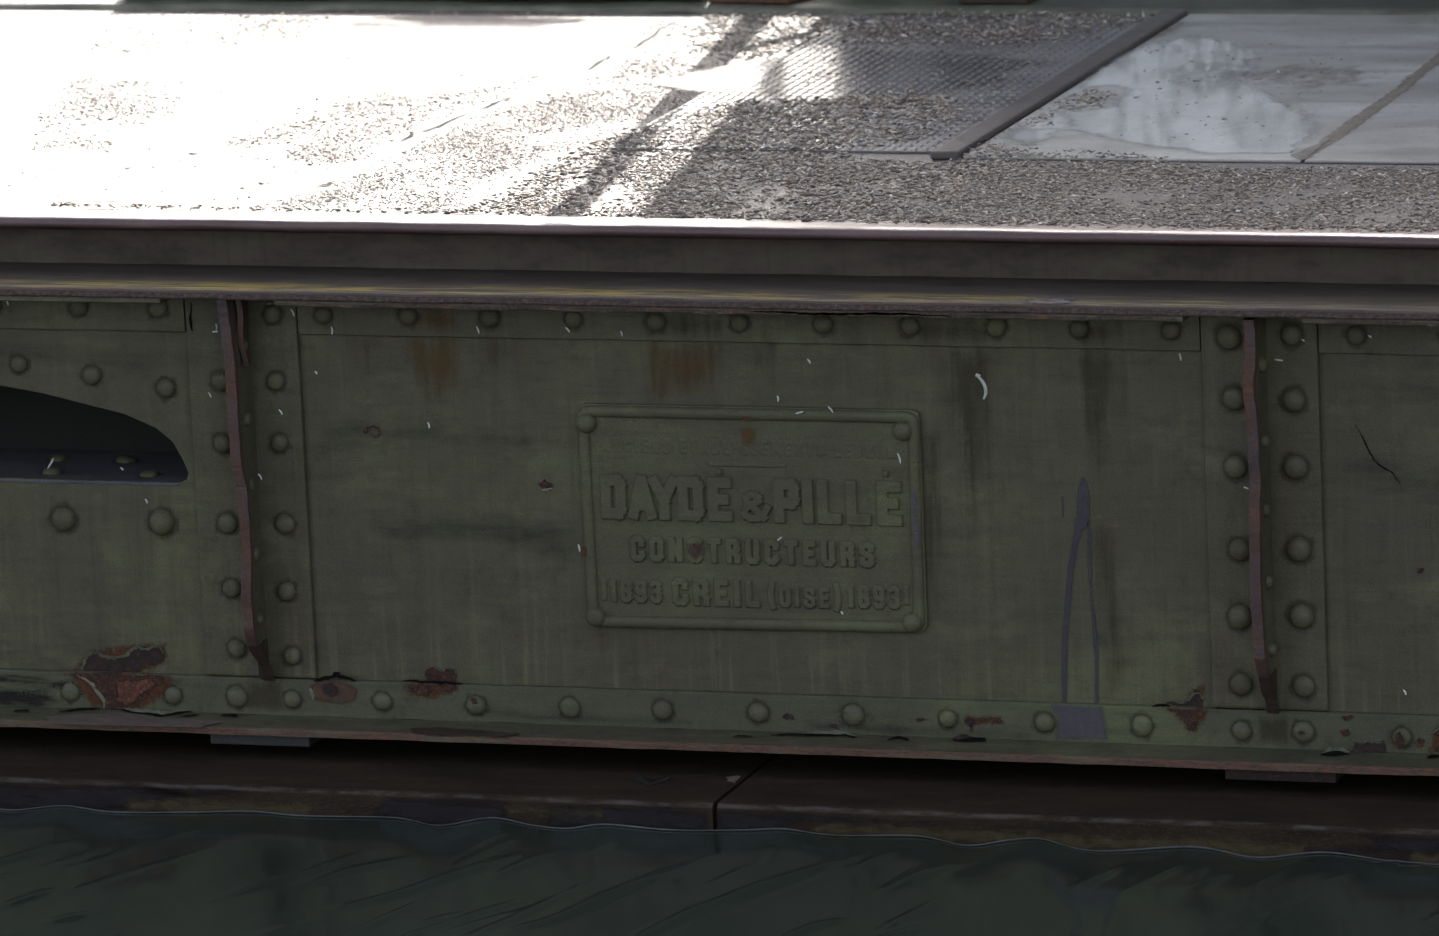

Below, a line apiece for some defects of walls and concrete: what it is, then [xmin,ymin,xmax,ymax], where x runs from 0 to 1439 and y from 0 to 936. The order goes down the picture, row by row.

crack [277,18,680,190]
crack [1355,425,1400,483]
rust [68,645,172,710]
rust [403,666,463,698]
peeling [44,712,221,728]
peeling [410,727,519,737]
rust [1151,687,1207,732]
rust [1340,714,1439,754]